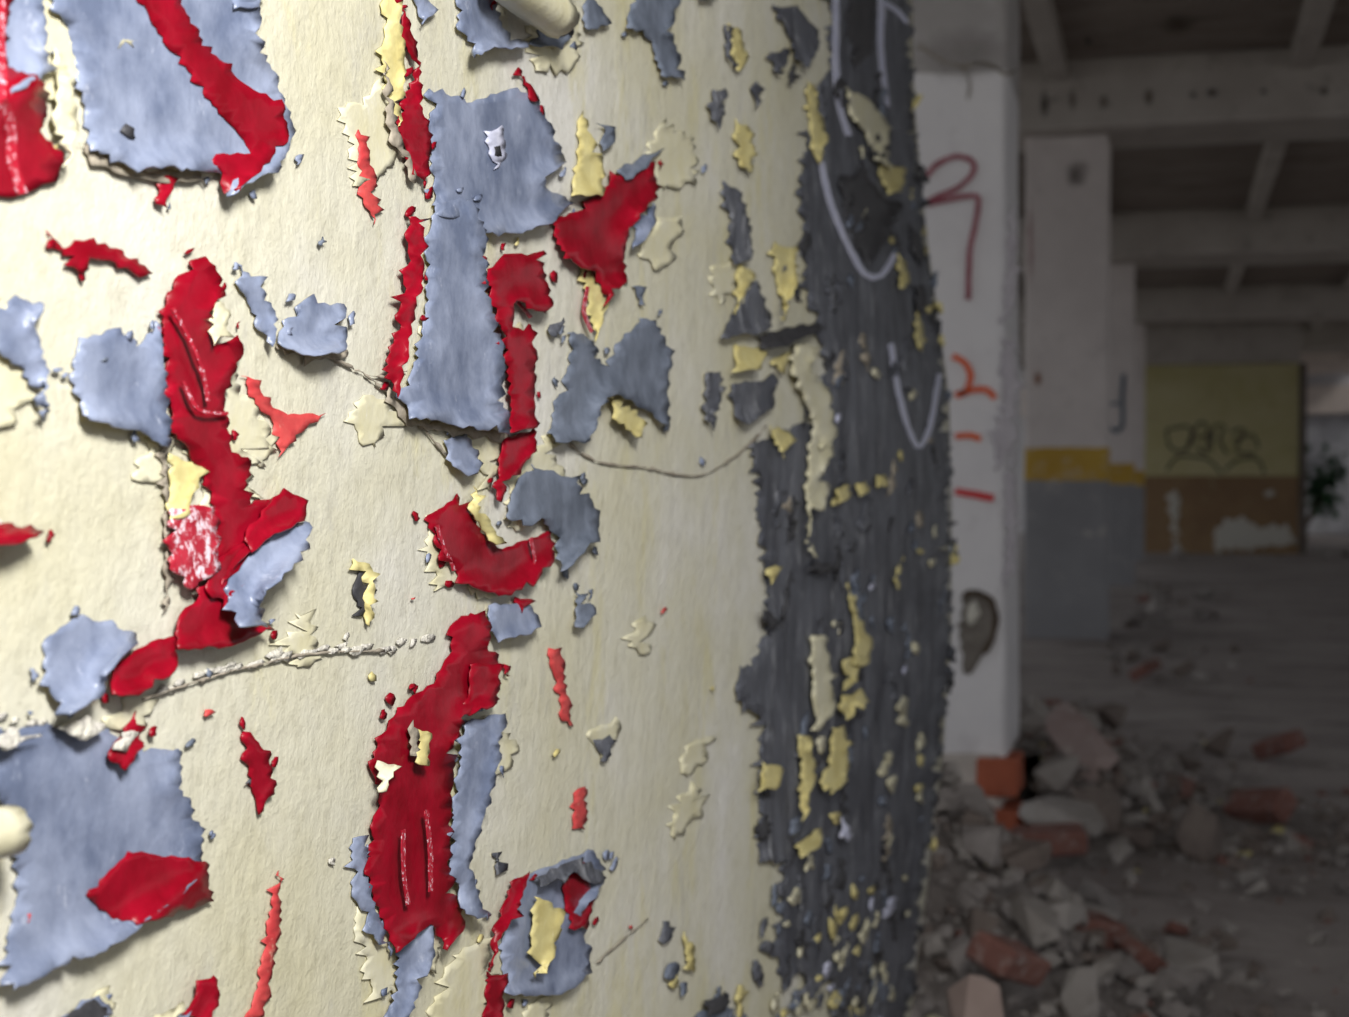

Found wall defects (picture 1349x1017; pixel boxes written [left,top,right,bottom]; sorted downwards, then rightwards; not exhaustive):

peeling [0,0,304,209]
peeling [45,230,153,282]
crack [569,425,768,477]
peeling [328,0,707,1017]
peeling [694,0,1025,1017]
flaking render [1213,516,1296,553]
peeling [0,248,356,990]
crack [142,634,436,701]
crack [0,712,48,726]
peeling [244,870,284,1017]
peeling [61,985,117,1017]
peeling [154,975,220,1017]